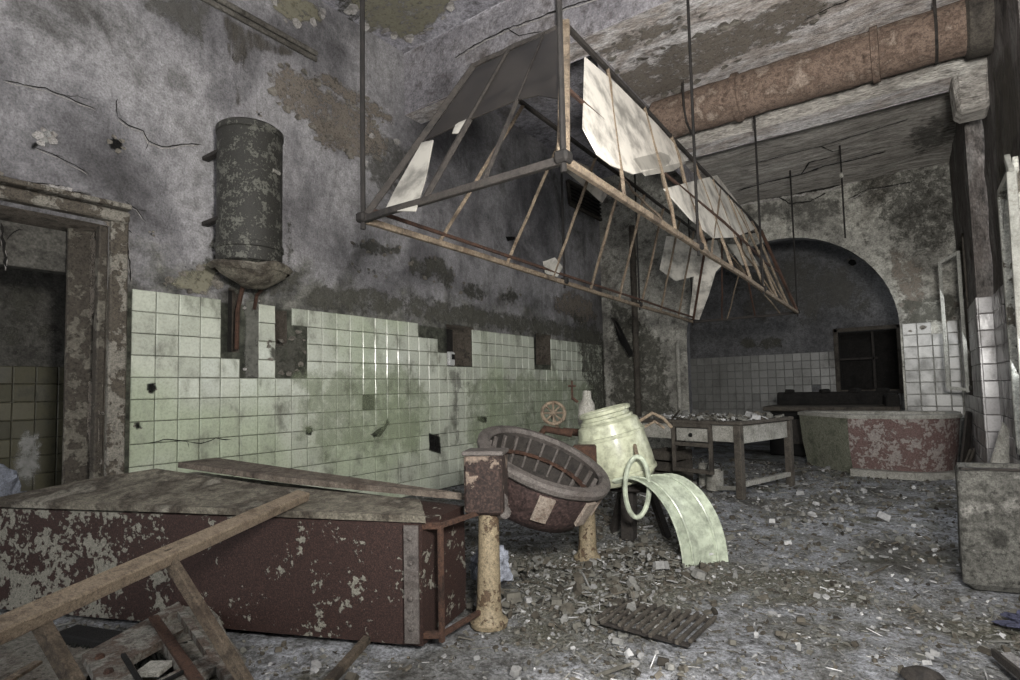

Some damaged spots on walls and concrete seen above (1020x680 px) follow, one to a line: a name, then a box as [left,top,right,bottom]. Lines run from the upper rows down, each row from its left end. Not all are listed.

flaking render [343,0,456,43]
crack [5,80,201,150]
flaking render [267,62,412,194]
spalling [266,330,307,376]